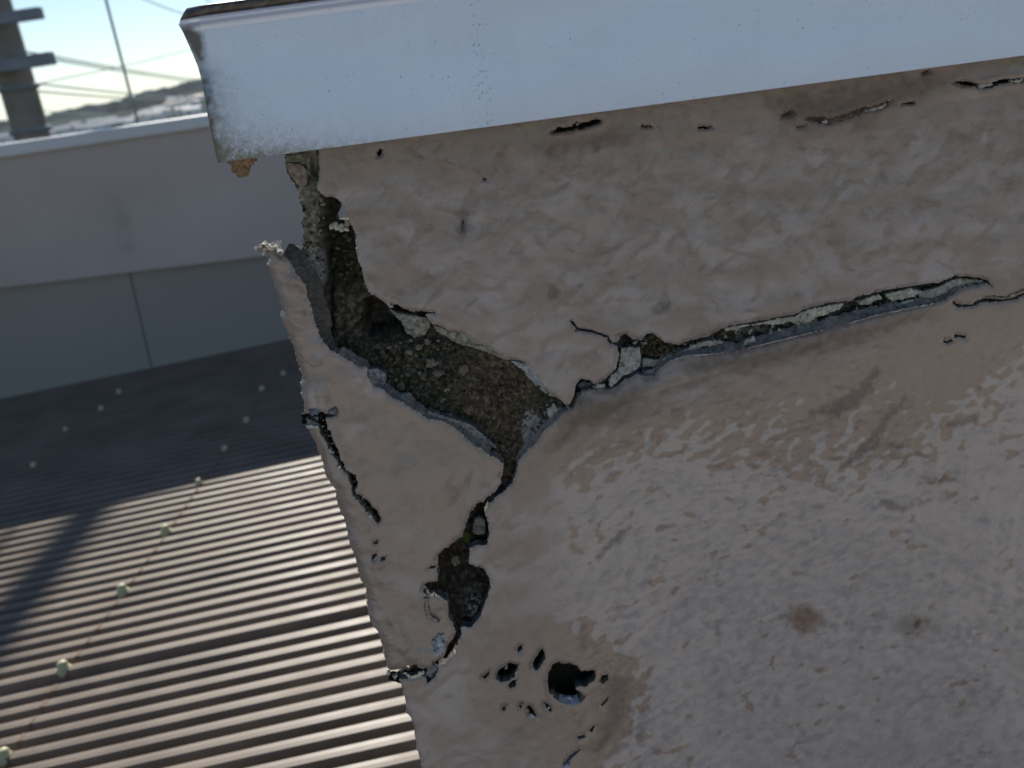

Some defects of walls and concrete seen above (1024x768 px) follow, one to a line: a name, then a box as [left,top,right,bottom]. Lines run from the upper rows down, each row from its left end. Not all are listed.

crack [575,275,1024,392]
crack [301,407,381,518]
spalling [254,150,578,670]